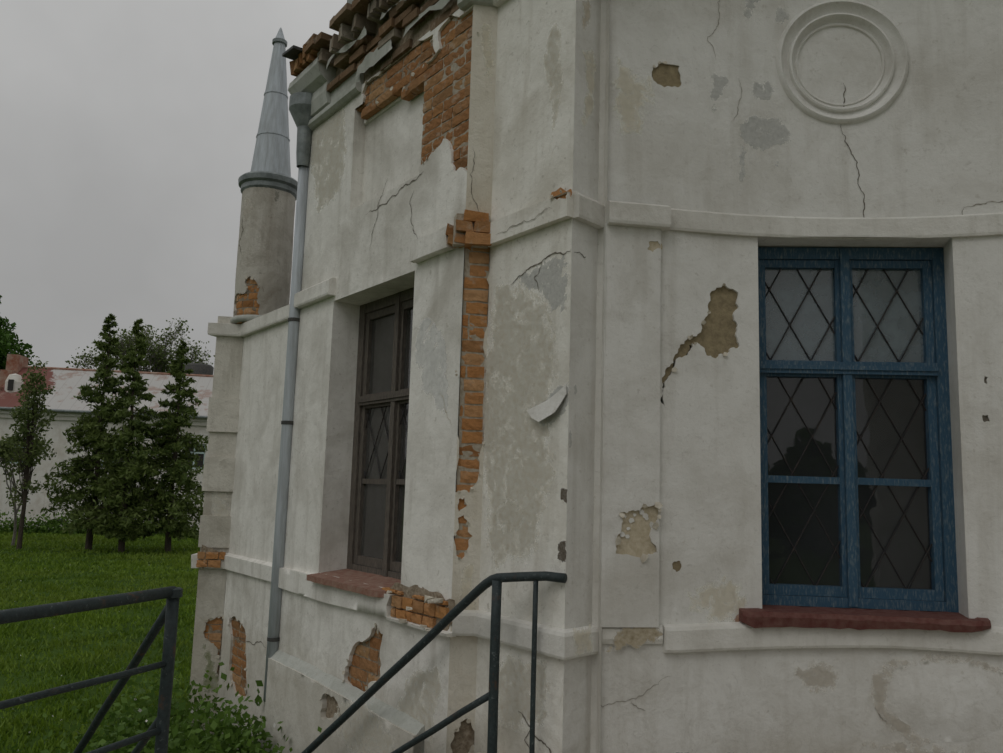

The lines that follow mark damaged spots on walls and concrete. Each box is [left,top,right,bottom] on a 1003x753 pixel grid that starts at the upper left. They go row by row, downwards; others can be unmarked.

flaking render [289,0,480,171]
spalling [652,61,681,87]
crack [840,83,865,217]
crack [367,173,422,241]
flaking render [445,209,492,250]
crack [512,251,586,290]
spalling [662,283,738,383]
flaking render [454,498,472,560]
flaking render [382,582,455,631]
flaking render [204,615,247,696]
flaking render [342,623,383,692]
crack [601,676,668,711]